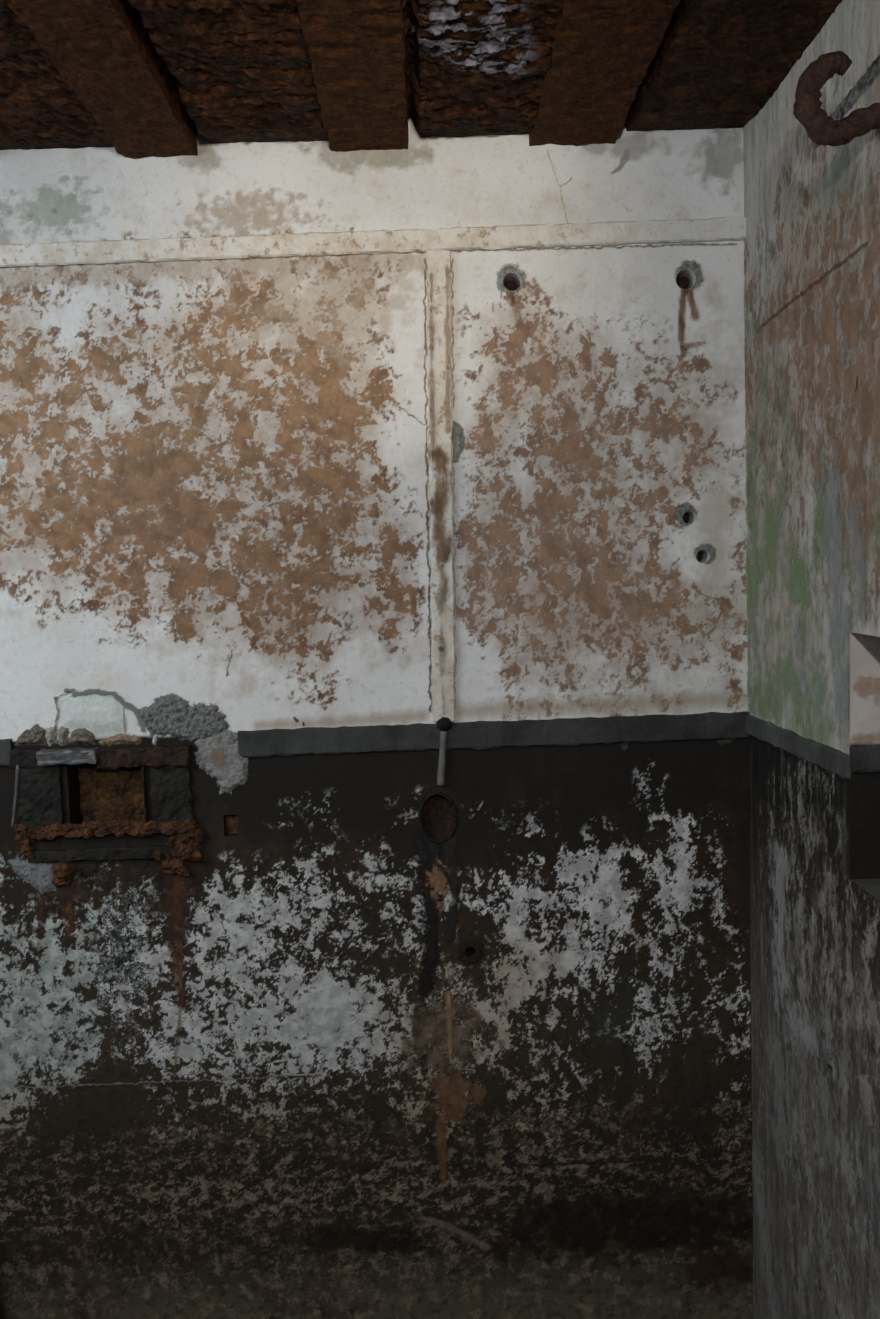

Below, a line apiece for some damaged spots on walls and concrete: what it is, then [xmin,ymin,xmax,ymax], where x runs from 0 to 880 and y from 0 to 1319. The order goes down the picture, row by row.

peeling [0,255,424,710]
peeling [452,135,880,718]
rust [678,289,700,355]
flaking render [14,693,248,794]
rust [39,846,205,1009]
leakage [412,833,460,1068]